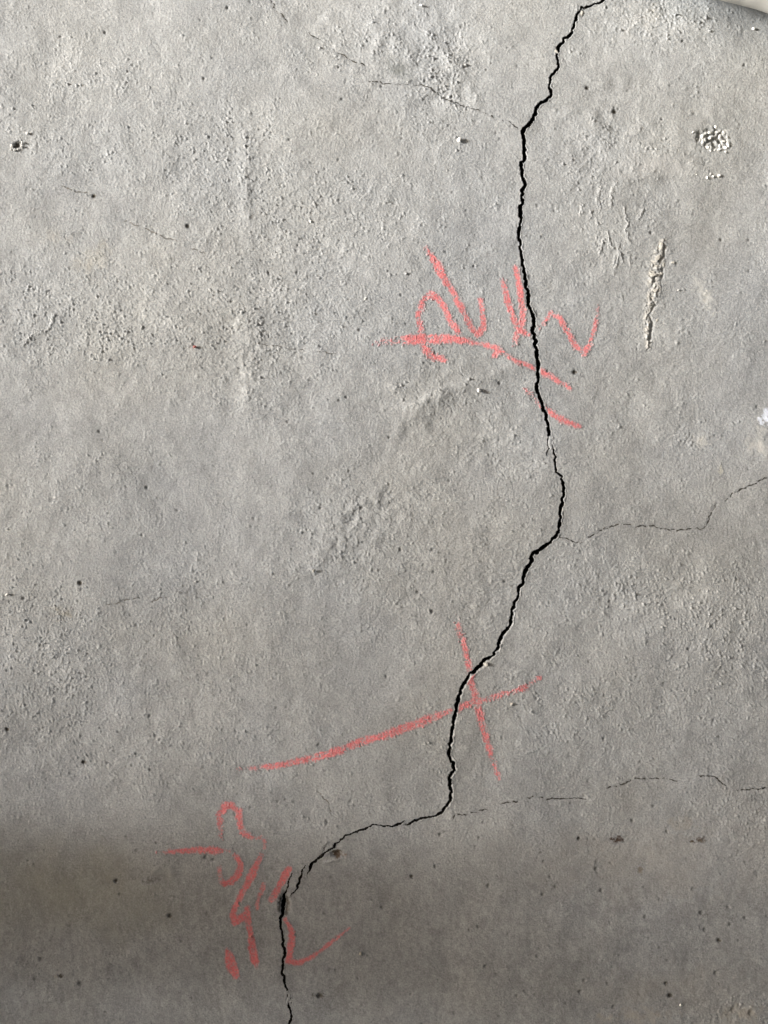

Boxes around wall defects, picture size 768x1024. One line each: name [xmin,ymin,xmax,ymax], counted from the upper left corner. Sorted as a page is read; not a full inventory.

crack [271,0,766,1024]